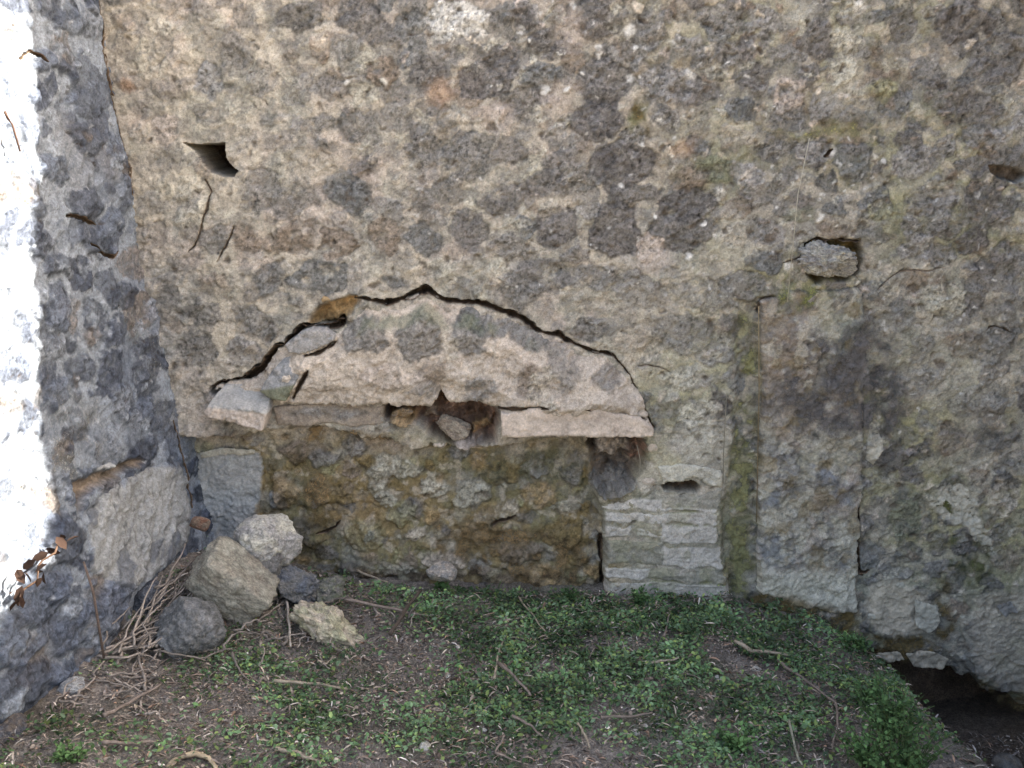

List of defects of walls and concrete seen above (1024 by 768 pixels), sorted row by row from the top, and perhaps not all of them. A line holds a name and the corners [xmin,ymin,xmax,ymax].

crack [188,180,212,252]
crack [217,226,234,261]
spalling [800,235,867,289]
crack [212,284,669,428]
spalling [379,389,502,450]
flaking render [196,448,265,541]
spalling [582,436,701,501]
crack [857,506,870,576]